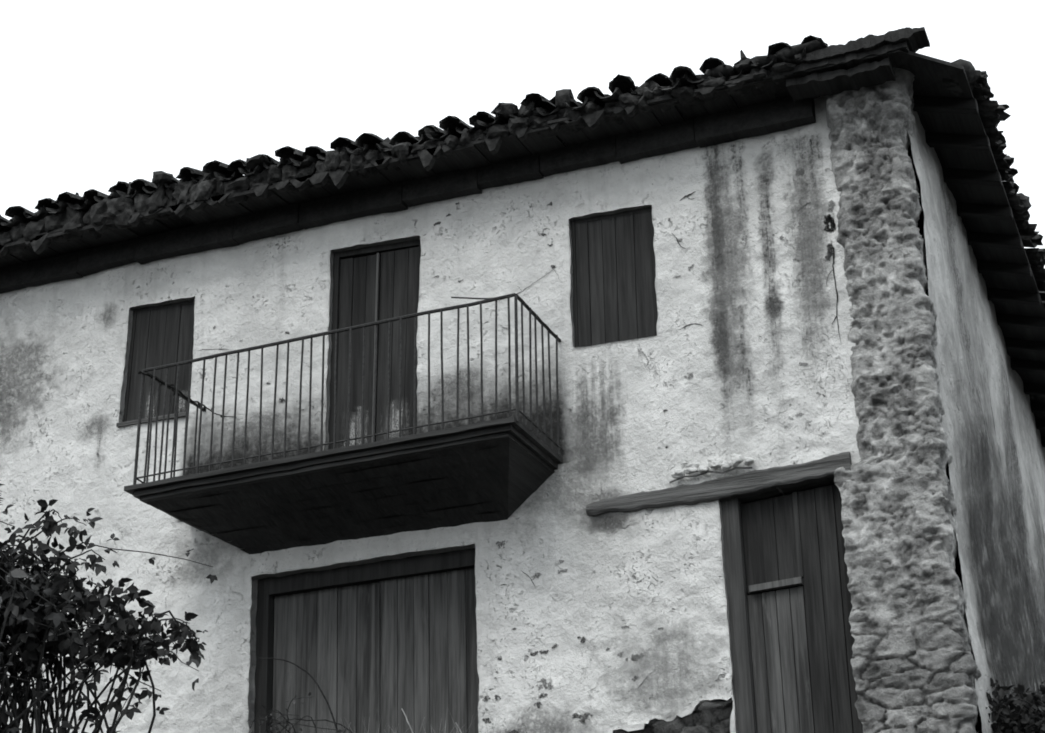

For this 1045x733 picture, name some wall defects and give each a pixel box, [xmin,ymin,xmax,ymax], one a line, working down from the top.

leakage [702,144,753,395]
leakage [759,156,783,352]
leakage [785,138,829,353]
peeling [669,454,755,484]
spalling [615,699,733,733]